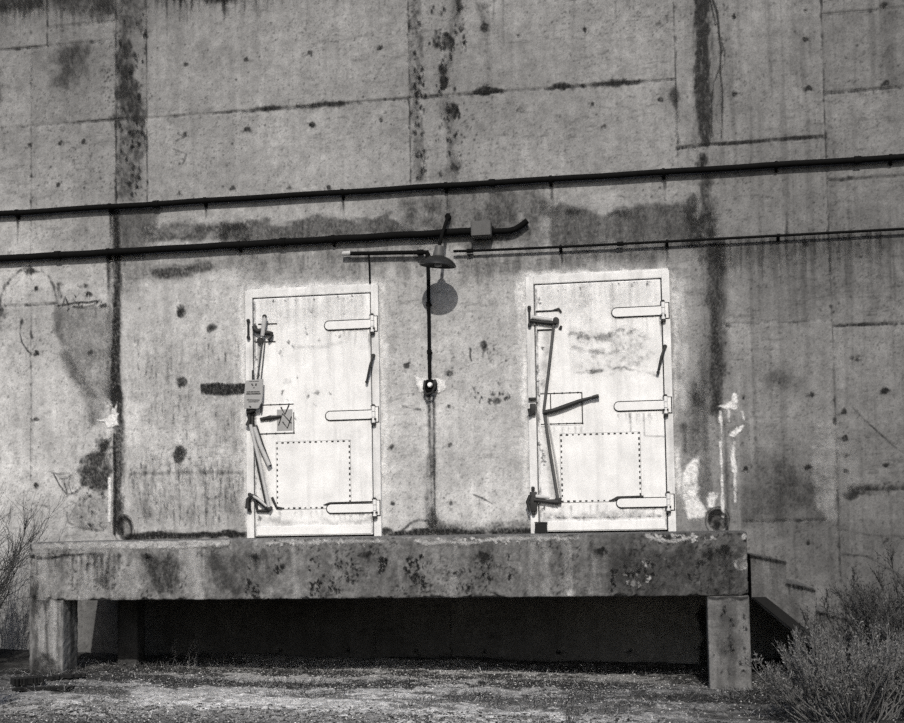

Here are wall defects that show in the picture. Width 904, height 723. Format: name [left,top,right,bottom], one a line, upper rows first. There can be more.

damp [54,45,91,86]
crack [710,0,723,137]
damp [300,100,360,108]
damp [467,0,726,451]
damp [54,188,457,573]
damp [844,485,870,499]
damp [382,511,531,536]